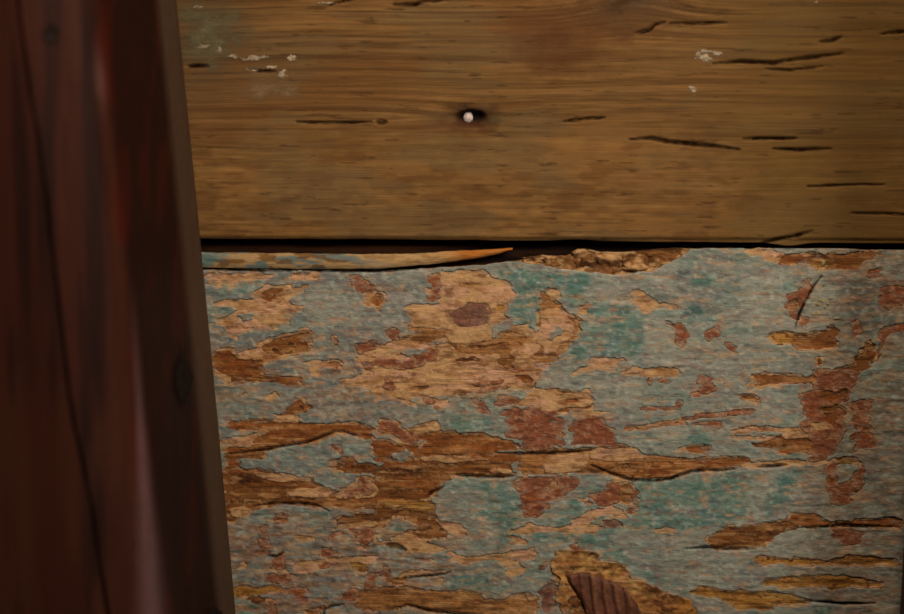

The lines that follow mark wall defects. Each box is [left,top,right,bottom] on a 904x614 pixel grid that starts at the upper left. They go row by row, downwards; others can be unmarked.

spalling [521,248,680,273]
peeling [630,289,678,315]
spalling [744,247,904,367]
peeling [665,321,690,348]
peeling [704,325,736,352]
peeling [571,357,681,387]
peeling [204,269,647,614]
peeling [640,372,865,506]
peeling [831,527,865,546]